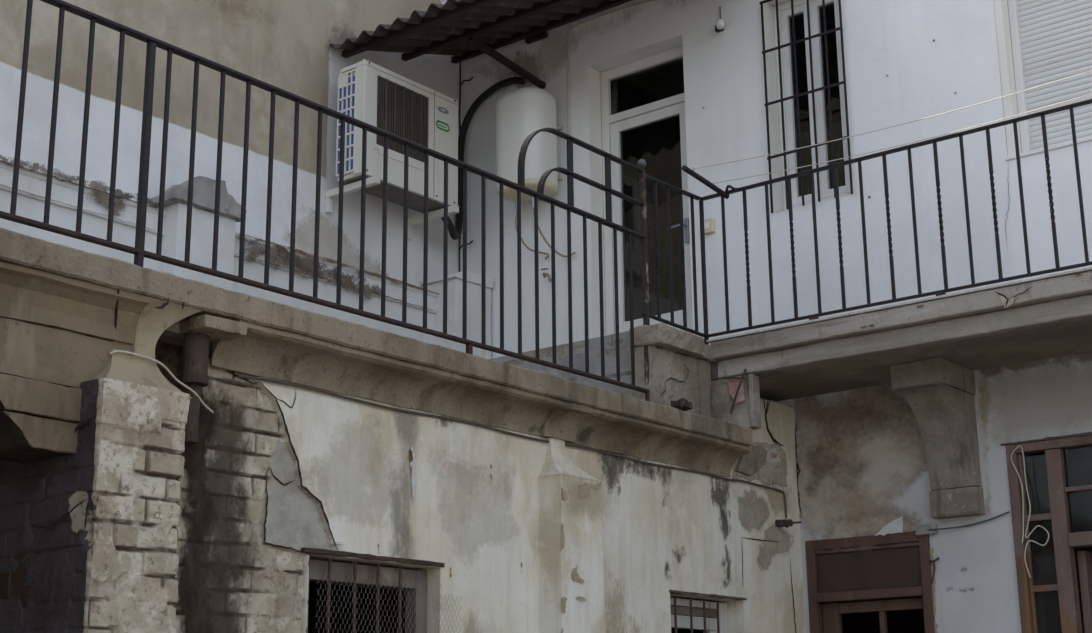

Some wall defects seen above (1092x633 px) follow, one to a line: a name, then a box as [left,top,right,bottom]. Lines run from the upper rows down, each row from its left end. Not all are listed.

spalling [69,491,88,533]
leakage [175,394,255,633]
leakage [394,406,416,556]
leakage [599,451,673,493]
leakage [711,476,731,586]
flaking render [738,490,792,570]
crack [760,394,802,519]
flaking render [875,516,937,536]
crack [742,537,797,633]